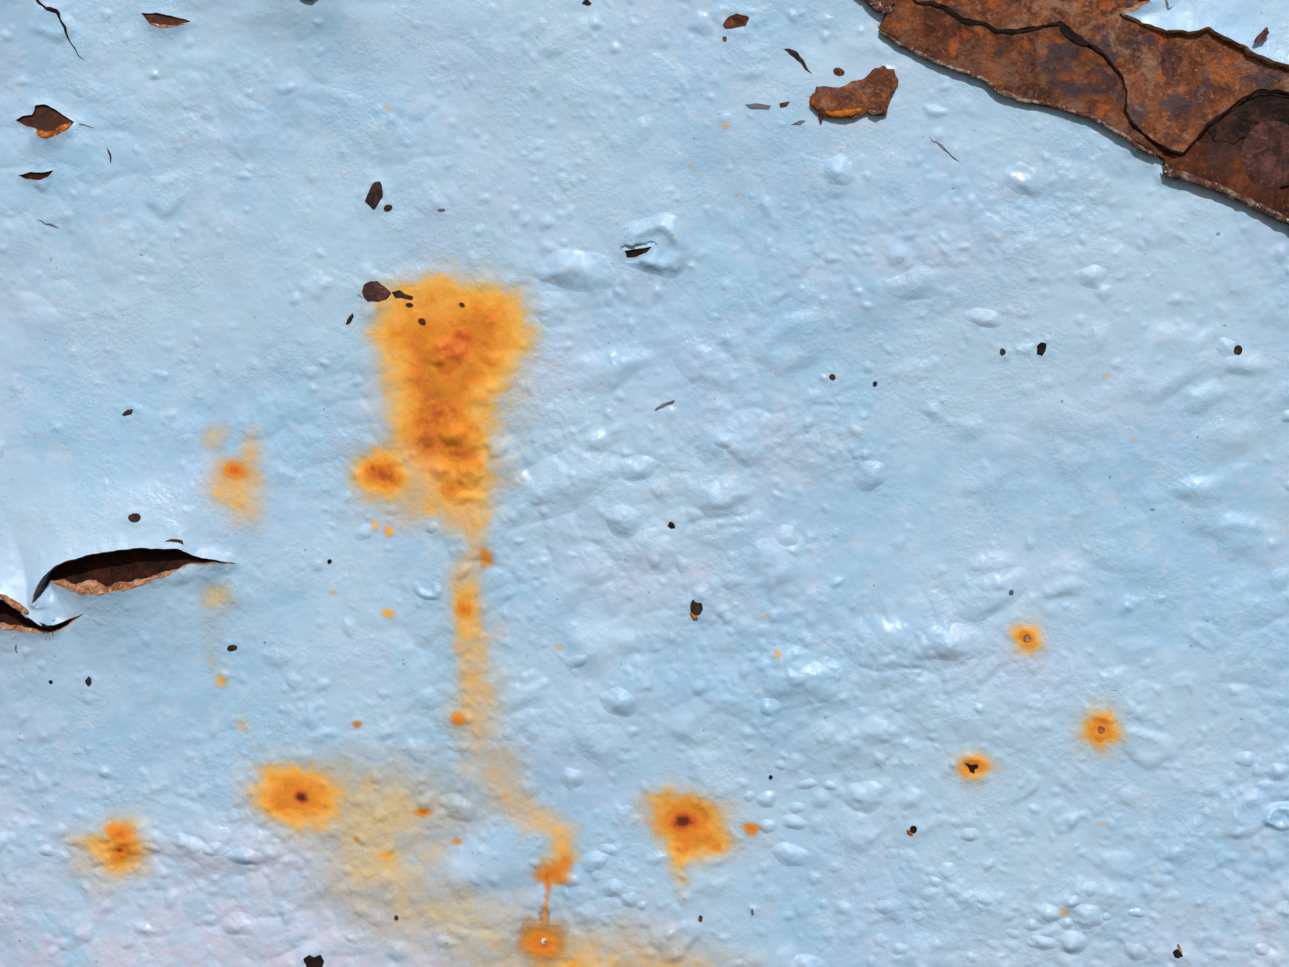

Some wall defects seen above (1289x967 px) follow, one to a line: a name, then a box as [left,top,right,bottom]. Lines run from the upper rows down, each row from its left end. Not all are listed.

peeling [1254,27,1269,43]
peeling [745,101,790,109]
corrosion [211,443,260,517]
corrosion [350,273,623,967]
corrosion [1009,625,1042,655]
corrosion [1080,709,1122,752]
corrosion [957,753,992,781]
corrosion [247,763,347,834]
corrosion [77,818,150,878]
corrosion [645,787,759,883]